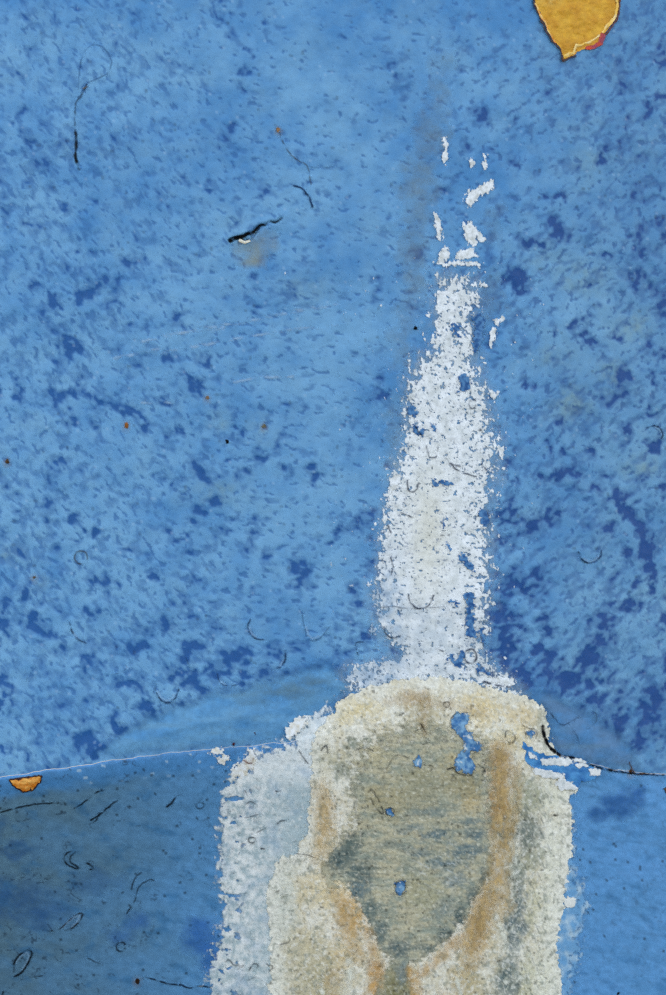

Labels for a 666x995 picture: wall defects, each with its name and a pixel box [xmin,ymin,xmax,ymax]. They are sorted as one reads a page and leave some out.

peeling [533,0,621,62]
peeling [463,153,494,208]
crack [228,219,281,244]
spalling [203,212,602,995]
crack [541,712,664,776]
peeling [9,775,42,793]
rust [451,744,519,946]